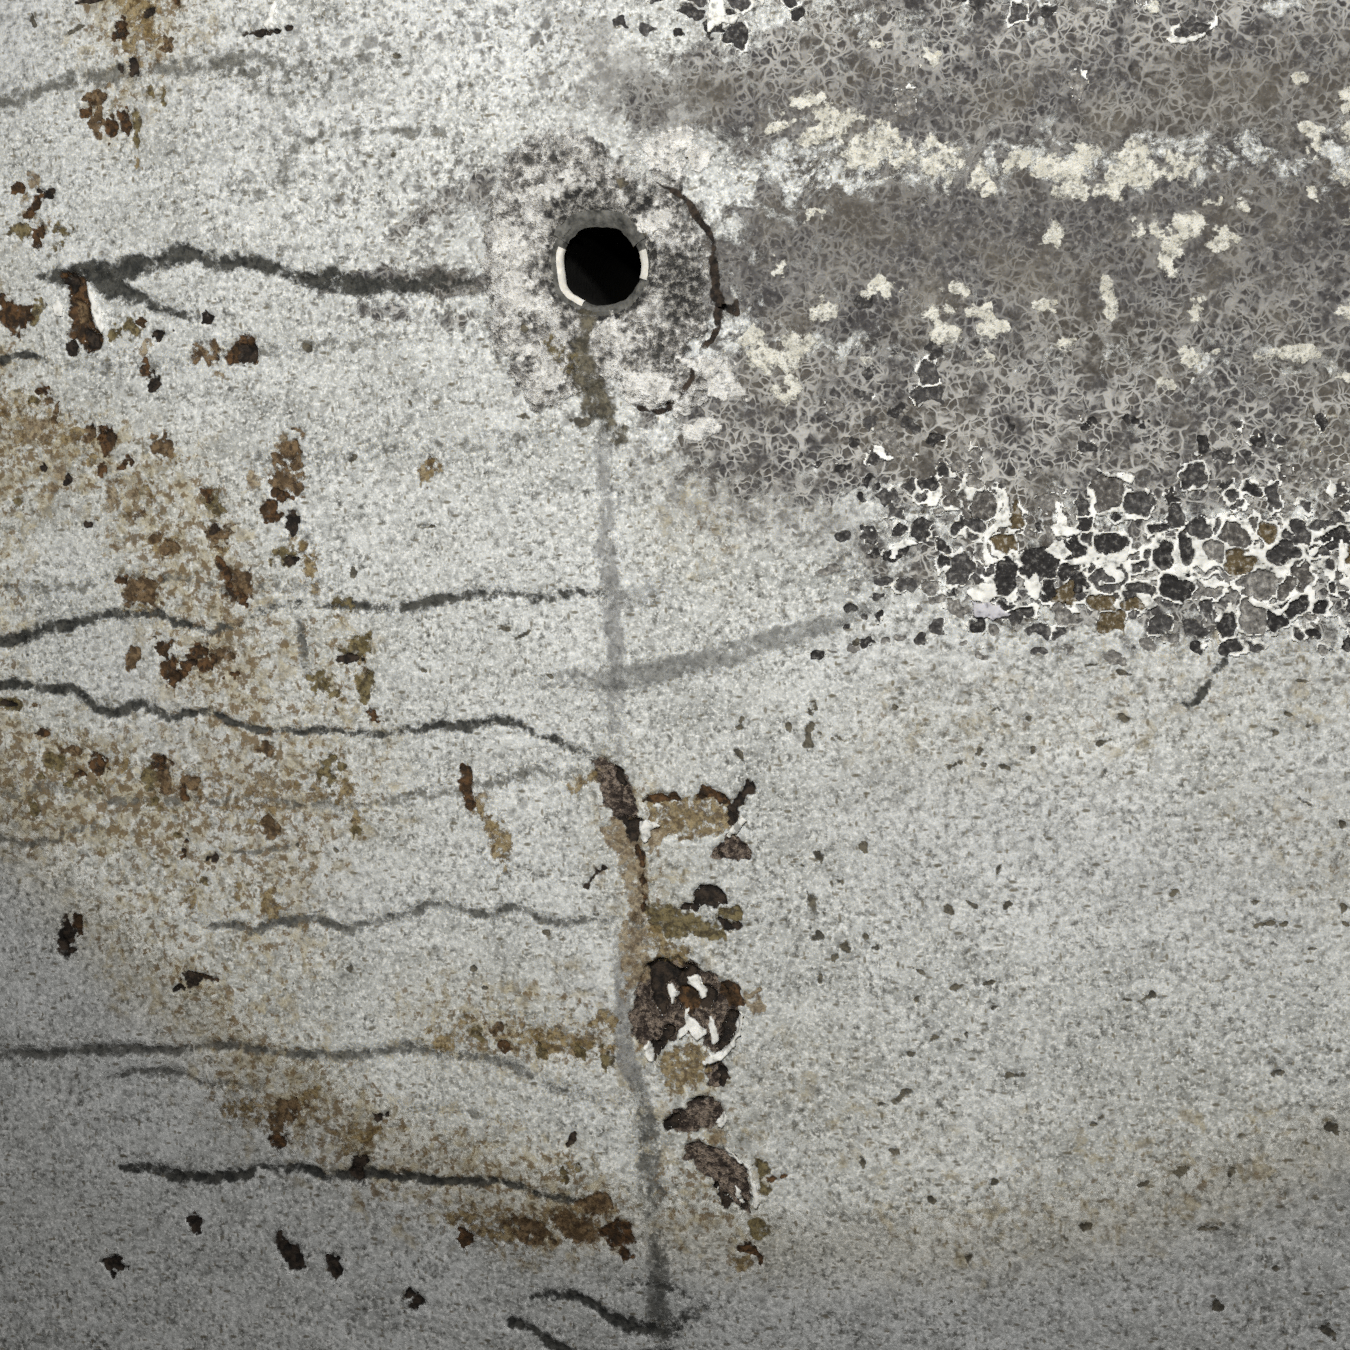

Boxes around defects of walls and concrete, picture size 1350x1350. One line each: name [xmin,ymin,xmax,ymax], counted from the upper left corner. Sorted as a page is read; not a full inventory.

peeling [612,15,657,38]
peeling [673,0,806,54]
rust [5,171,74,252]
crack [37,241,475,321]
crack [635,182,740,414]
rust [191,310,259,379]
leakage [543,0,1350,733]
rust [247,427,320,594]
peeling [810,341,1350,660]
rust [125,634,240,688]
crack [0,574,604,849]
crack [208,901,607,935]